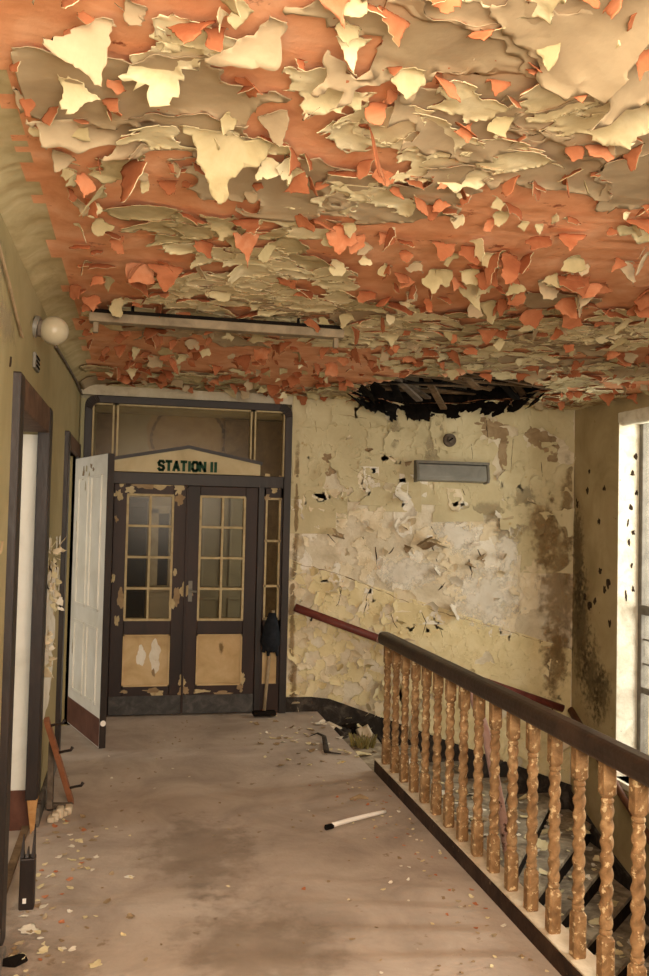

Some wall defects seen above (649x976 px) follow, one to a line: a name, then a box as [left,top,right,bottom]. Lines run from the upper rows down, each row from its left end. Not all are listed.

peeling [9,0,649,784]
leakage [532,467,573,698]